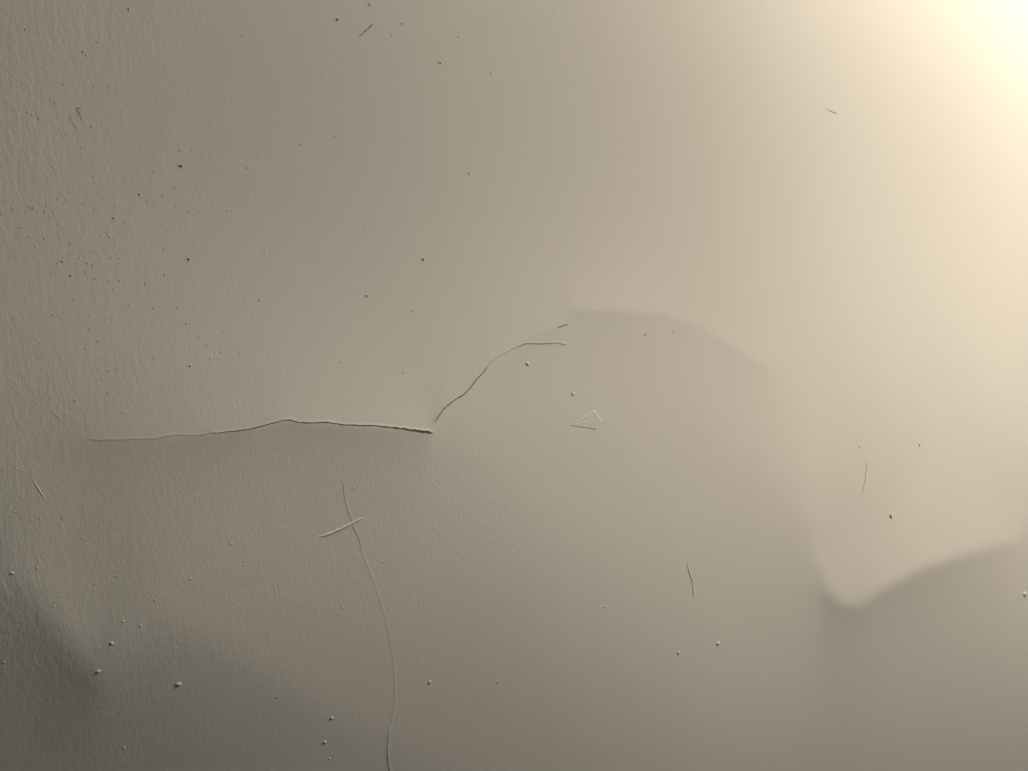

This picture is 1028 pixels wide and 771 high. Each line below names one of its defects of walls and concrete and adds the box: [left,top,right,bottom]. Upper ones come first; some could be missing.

crack [341,480,398,771]